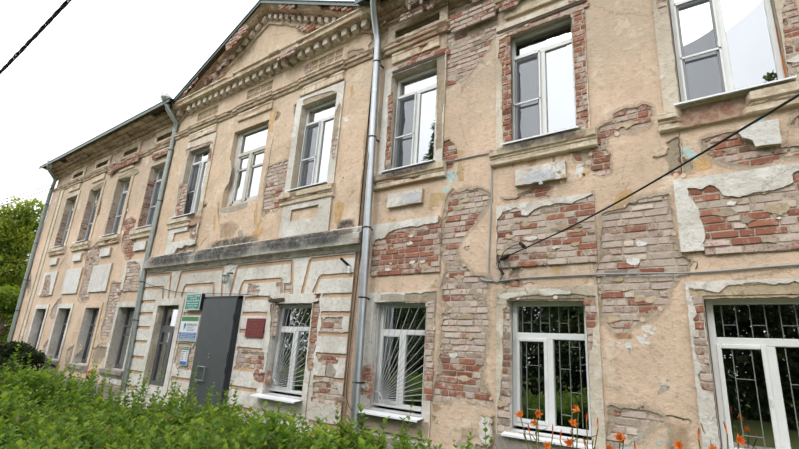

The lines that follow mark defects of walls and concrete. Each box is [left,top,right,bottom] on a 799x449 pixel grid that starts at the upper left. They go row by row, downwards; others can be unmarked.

flaking render [782,0,799,81]
flaking render [654,129,799,178]
flaking render [213,159,289,238]
flaking render [370,0,693,449]
flaking render [688,171,799,255]
flaking render [65,205,141,371]
flaking render [236,349,271,385]
spalling [688,281,799,400]